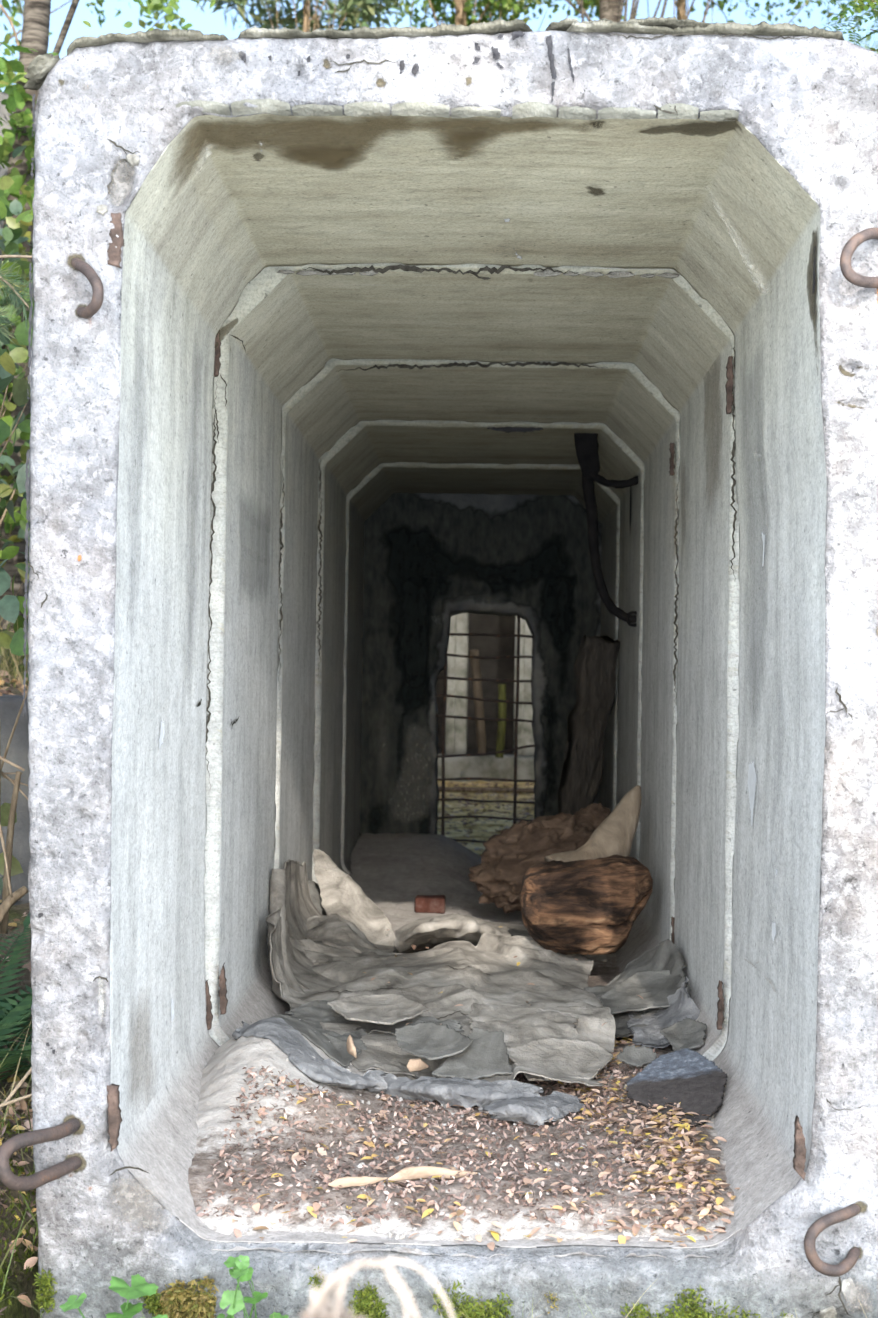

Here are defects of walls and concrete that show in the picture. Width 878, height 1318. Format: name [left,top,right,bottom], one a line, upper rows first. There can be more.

leakage [179,117,560,174]
crack [304,264,578,280]
crack [338,361,608,372]
crack [197,374,239,785]